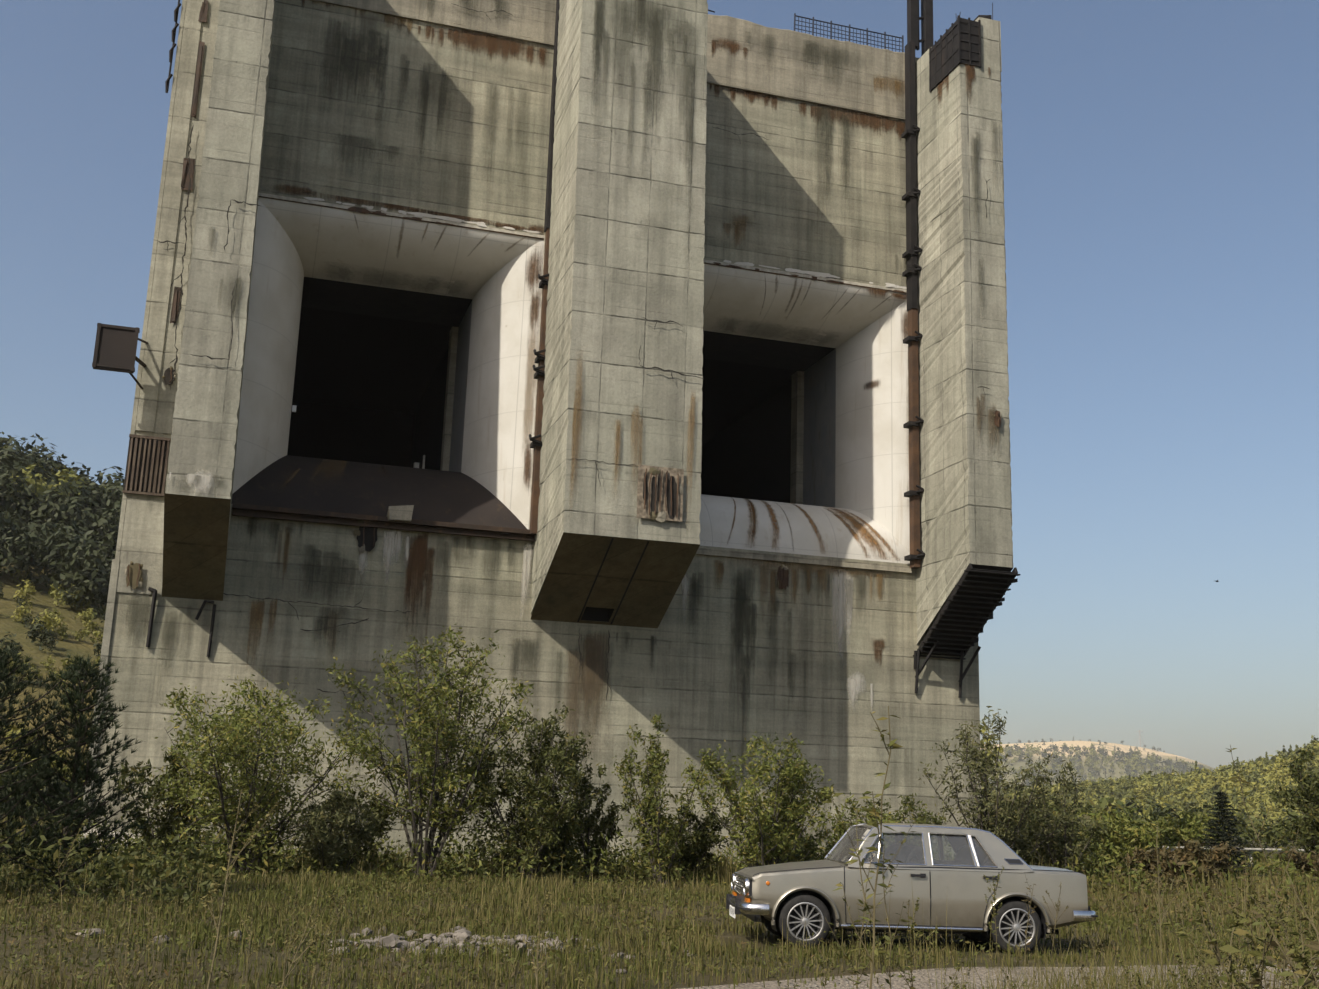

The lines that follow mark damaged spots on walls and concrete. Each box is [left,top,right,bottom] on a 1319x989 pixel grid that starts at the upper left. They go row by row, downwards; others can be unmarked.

corrosion [418,25,546,63]
corrosion [712,39,747,56]
corrosion [710,84,777,108]
corrosion [800,103,904,136]
crack [156,123,235,390]
corrosion [528,254,541,324]
corrosion [729,498,779,542]
corrosion [791,503,823,548]
corrosion [830,508,893,556]
corrosion [406,533,434,618]
corrosion [873,640,884,660]